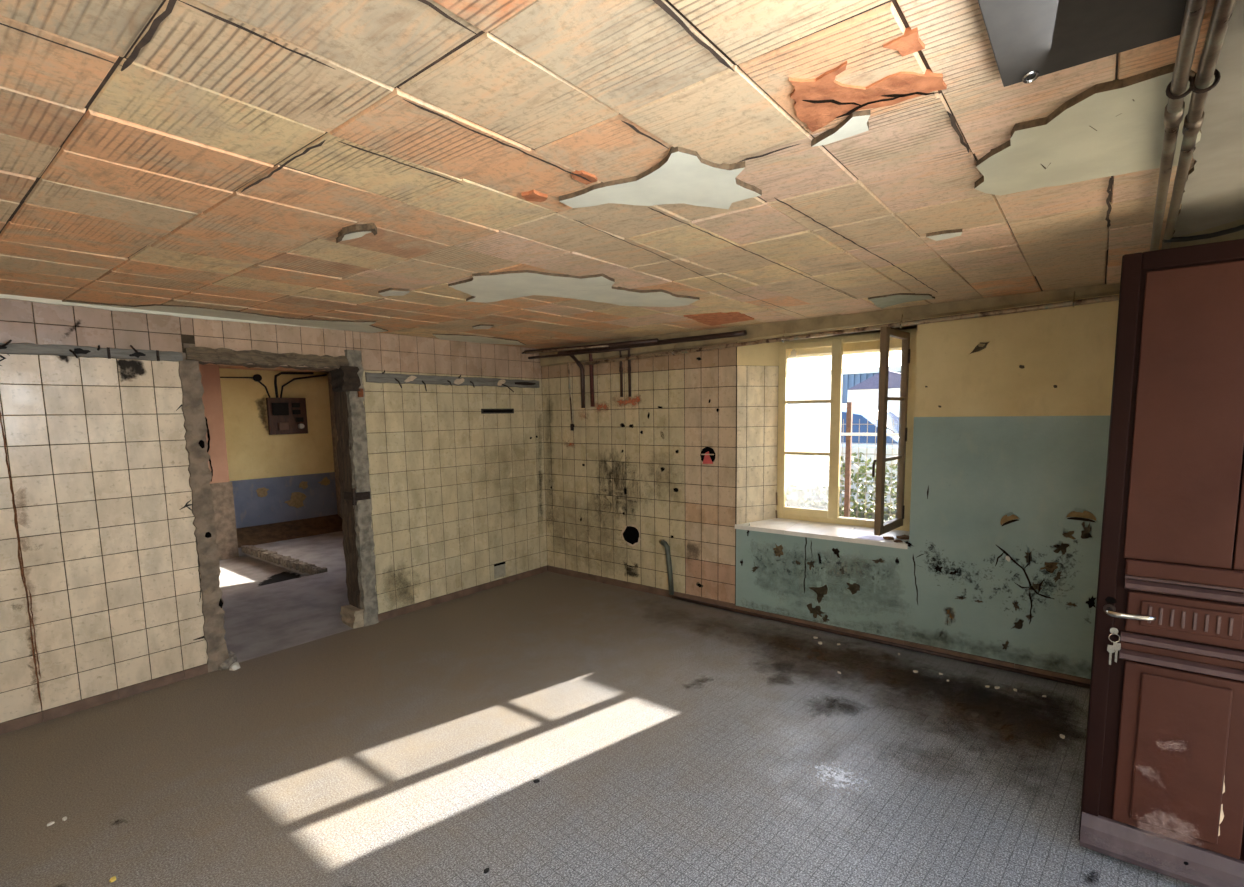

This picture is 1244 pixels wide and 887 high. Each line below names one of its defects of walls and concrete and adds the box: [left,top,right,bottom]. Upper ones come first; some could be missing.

spalling [789,27,947,132]
spalling [571,170,597,185]
crack [0,411,42,707]
water stain [594,455,640,515]
peeling [773,543,861,623]
peeling [1000,511,1020,526]
peeling [1002,600,1034,650]
crack [995,545,1054,624]
peeling [1006,508,1098,592]
peeling [1066,595,1097,609]